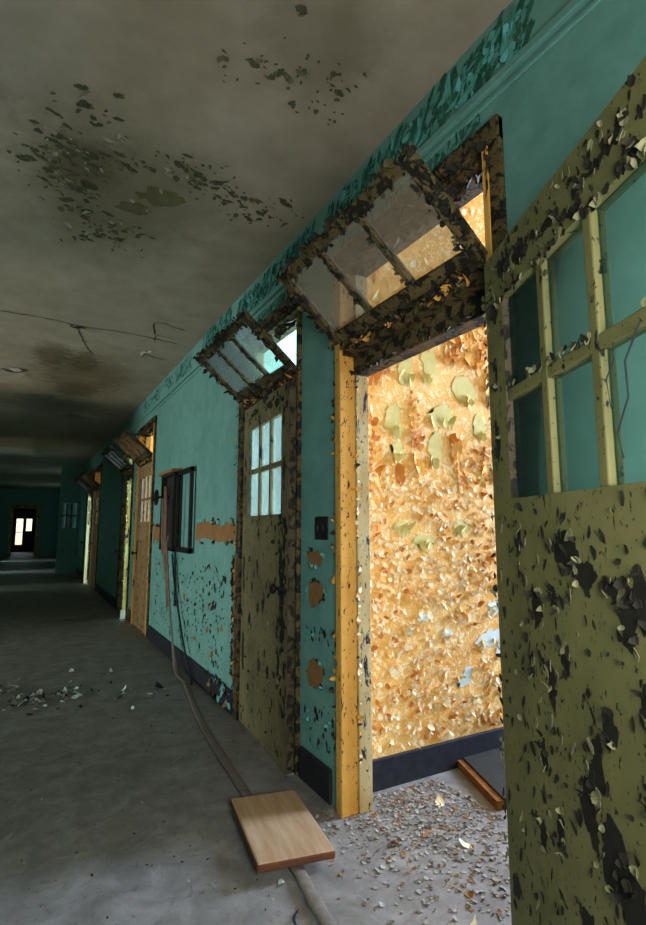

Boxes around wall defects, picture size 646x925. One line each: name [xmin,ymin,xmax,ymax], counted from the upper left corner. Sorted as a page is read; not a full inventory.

peeling [74,84,125,127]
peeling [6,92,305,258]
crack [3,311,182,360]
peeling [144,0,646,925]